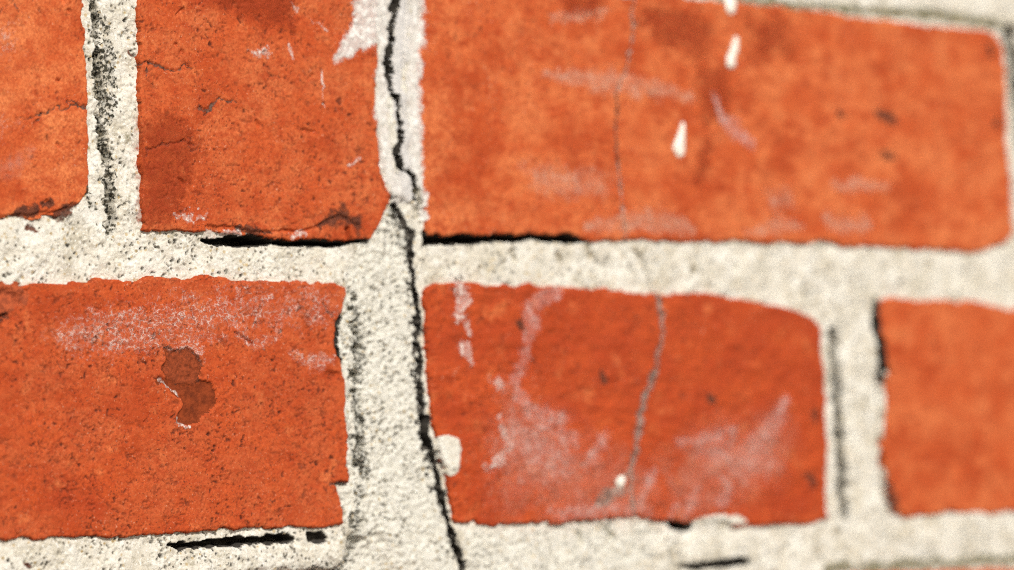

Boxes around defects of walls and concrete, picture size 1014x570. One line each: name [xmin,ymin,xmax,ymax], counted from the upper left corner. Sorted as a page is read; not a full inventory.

peeling [0,281,29,322]
crack [382,0,466,570]
efflorescence [452,279,473,363]
crack [605,0,666,518]
spalling [155,345,216,429]